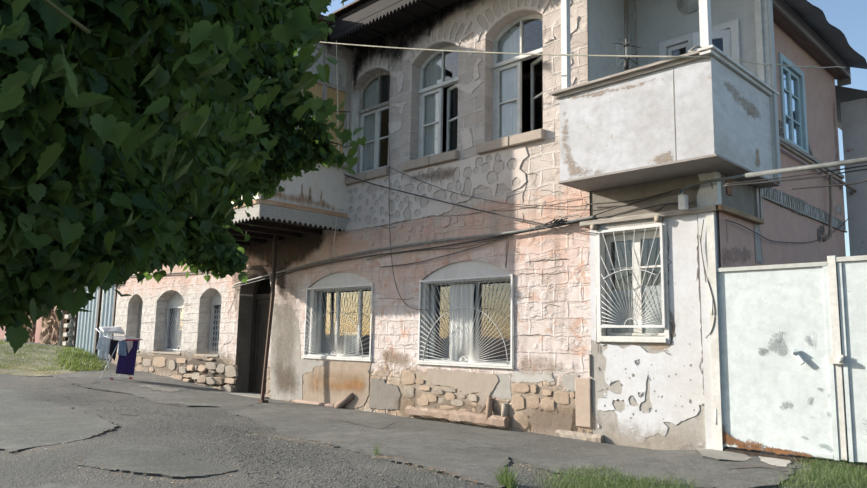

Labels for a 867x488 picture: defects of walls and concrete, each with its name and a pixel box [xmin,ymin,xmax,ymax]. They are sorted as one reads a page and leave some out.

peeling [726,82,760,119]
peeling [562,112,601,179]
peeling [597,355,706,447]
corrosion [722,425,812,457]